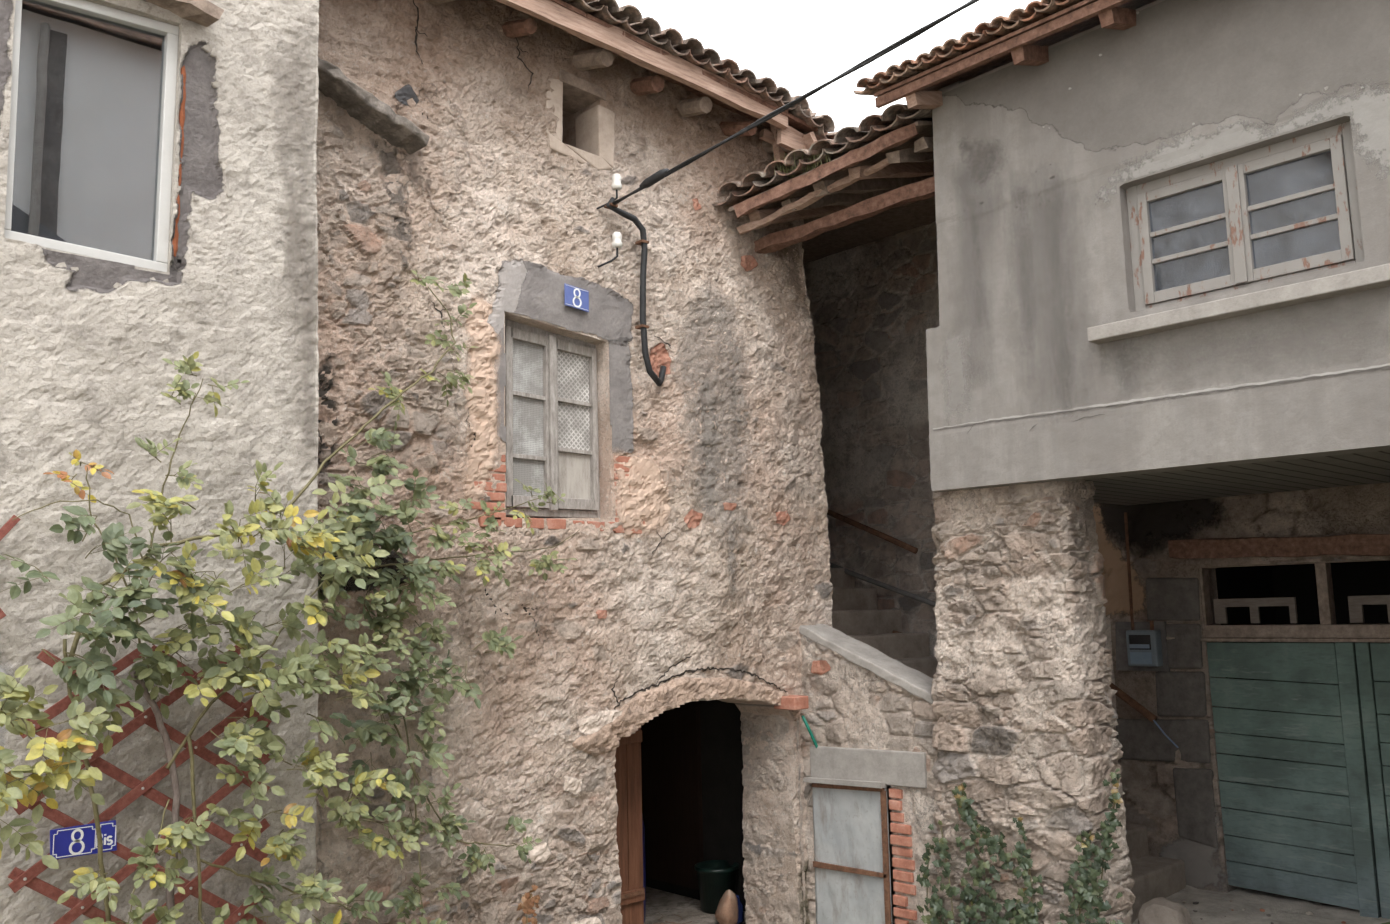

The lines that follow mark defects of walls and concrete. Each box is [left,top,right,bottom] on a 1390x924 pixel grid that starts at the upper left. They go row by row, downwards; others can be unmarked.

spalling [0,0,13,115]
spalling [42,41,233,293]
peeling [942,0,1390,205]
crack [611,656,787,710]